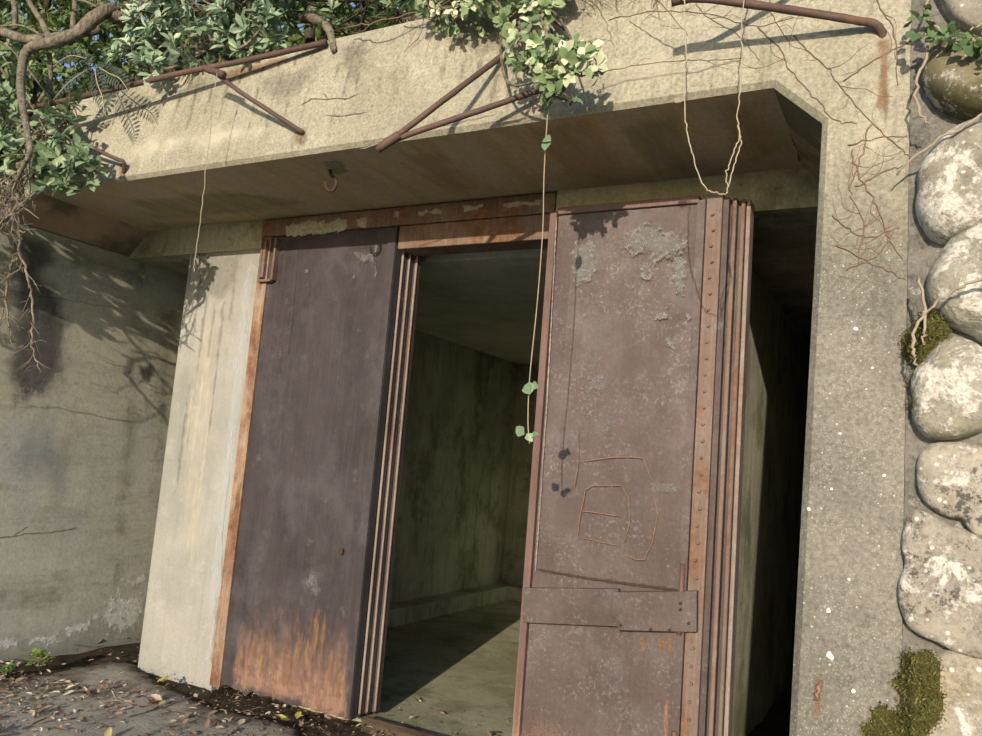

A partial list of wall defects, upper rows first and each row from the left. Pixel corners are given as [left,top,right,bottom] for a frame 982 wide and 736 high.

rust [227,53,313,82]
rust [878,41,887,107]
crack [300,93,366,117]
peeling [285,217,367,237]
peeling [569,240,597,286]
peeling [621,221,688,296]
damp [13,239,62,394]
damp [140,366,153,381]
crack [0,526,77,538]
damp [29,574,146,647]
rust [235,643,345,715]